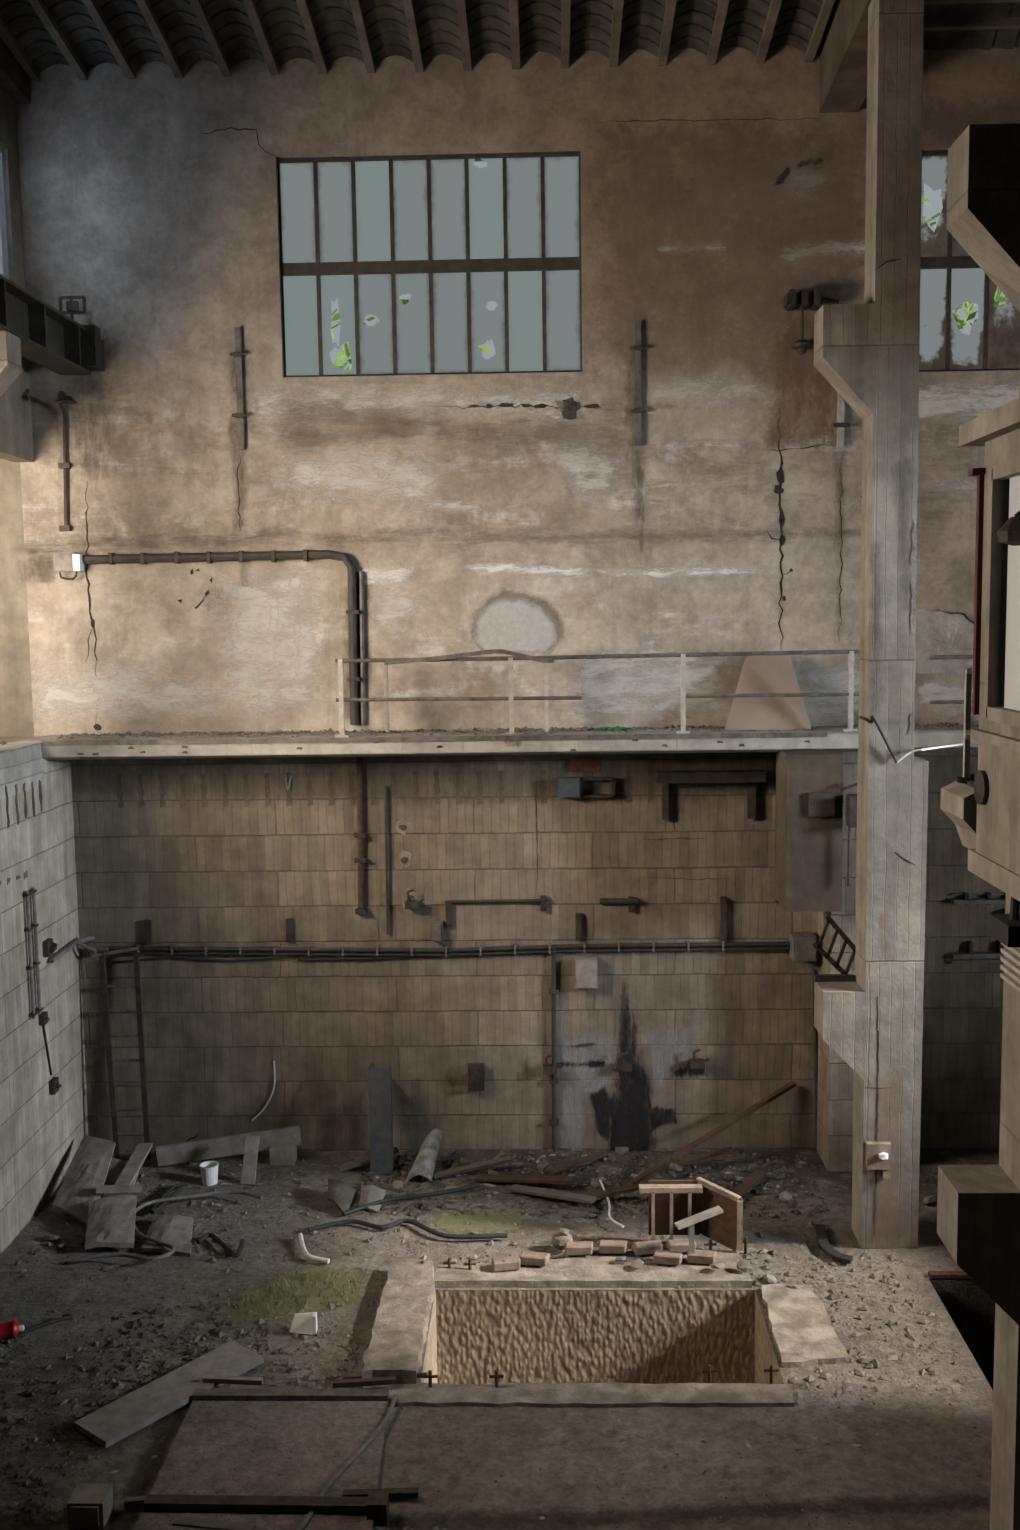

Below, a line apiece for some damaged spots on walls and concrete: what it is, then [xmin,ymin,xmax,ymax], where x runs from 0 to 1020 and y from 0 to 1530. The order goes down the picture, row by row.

crack [85,488,102,730]
crack [767,408,844,645]
water stain [590,1088,615,1145]
water stain [650,1106,677,1129]